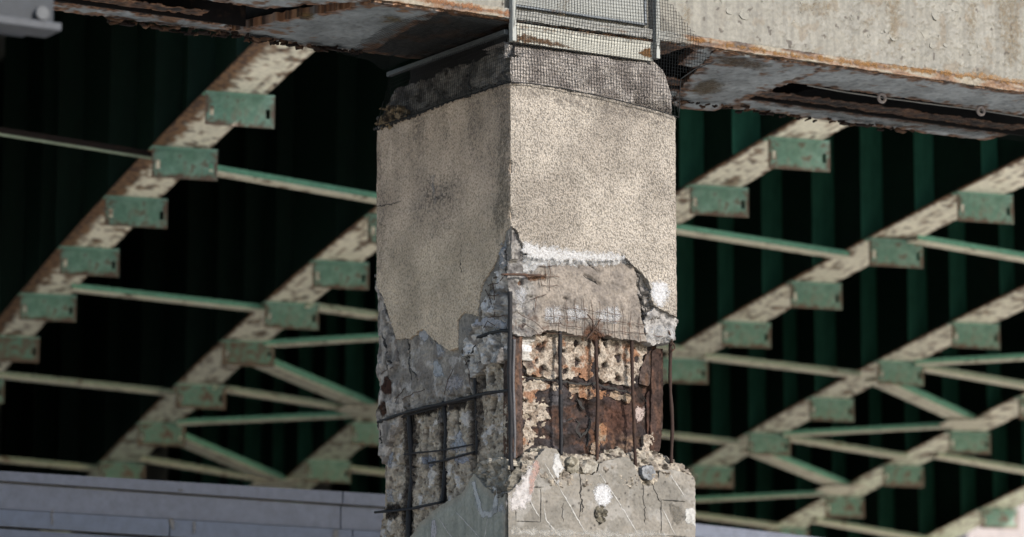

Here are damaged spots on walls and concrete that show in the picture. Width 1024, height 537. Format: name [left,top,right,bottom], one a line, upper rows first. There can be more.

corrosion [717,43,1024,85]
spalling [374,226,695,537]
crack [518,474,584,522]
crack [642,482,687,537]